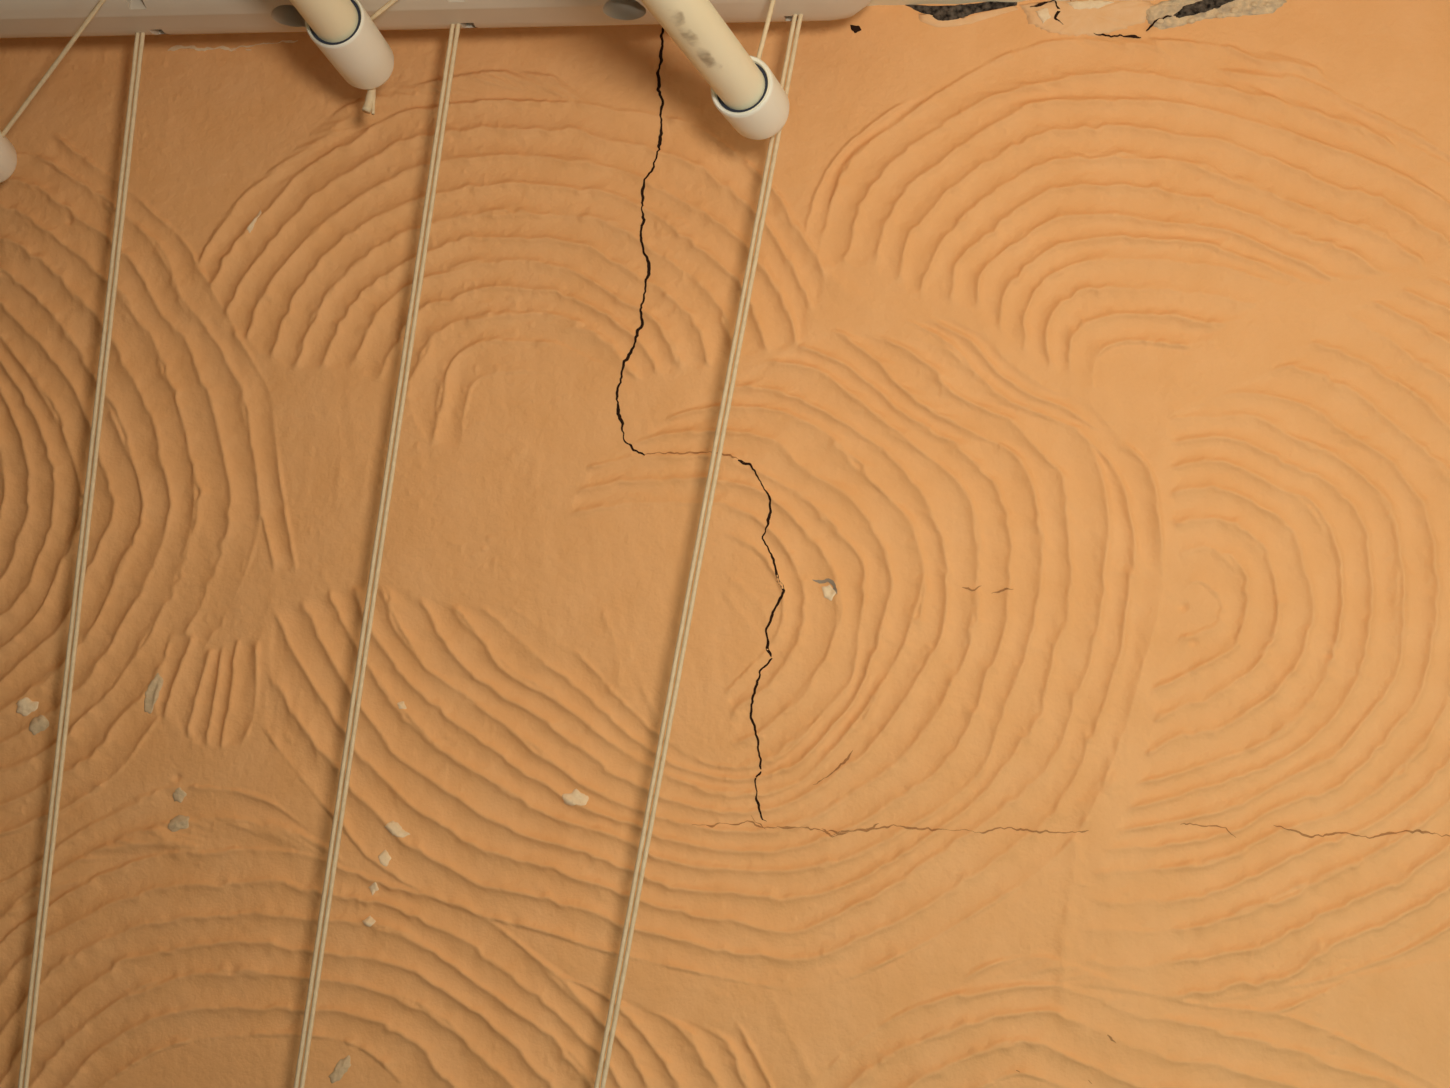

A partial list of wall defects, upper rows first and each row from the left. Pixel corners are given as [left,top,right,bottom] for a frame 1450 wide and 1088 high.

flaking render [918,0,1287,38]
crack [616,27,1089,837]
crack [1180,823,1235,837]
crack [1274,825,1450,839]